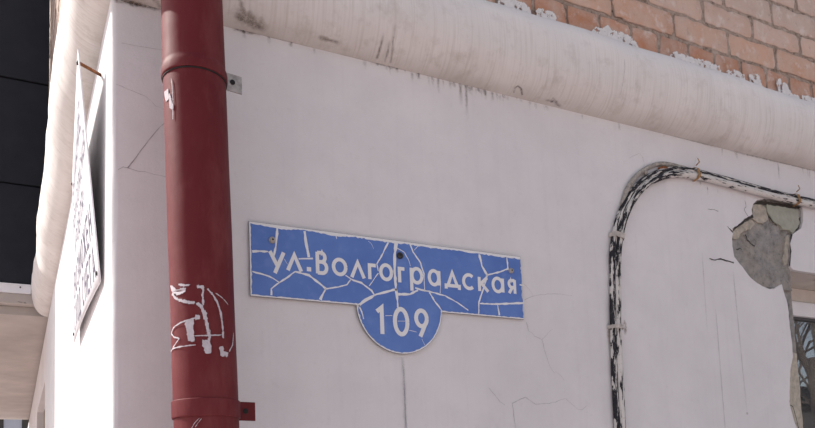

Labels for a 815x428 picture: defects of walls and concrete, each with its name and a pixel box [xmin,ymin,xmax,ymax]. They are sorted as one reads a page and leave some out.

peeling [592,25,638,47]
peeling [671,51,762,86]
peeling [776,78,815,103]
crack [117,84,165,177]
flaking render [709,199,801,291]
flaking render [789,353,803,428]